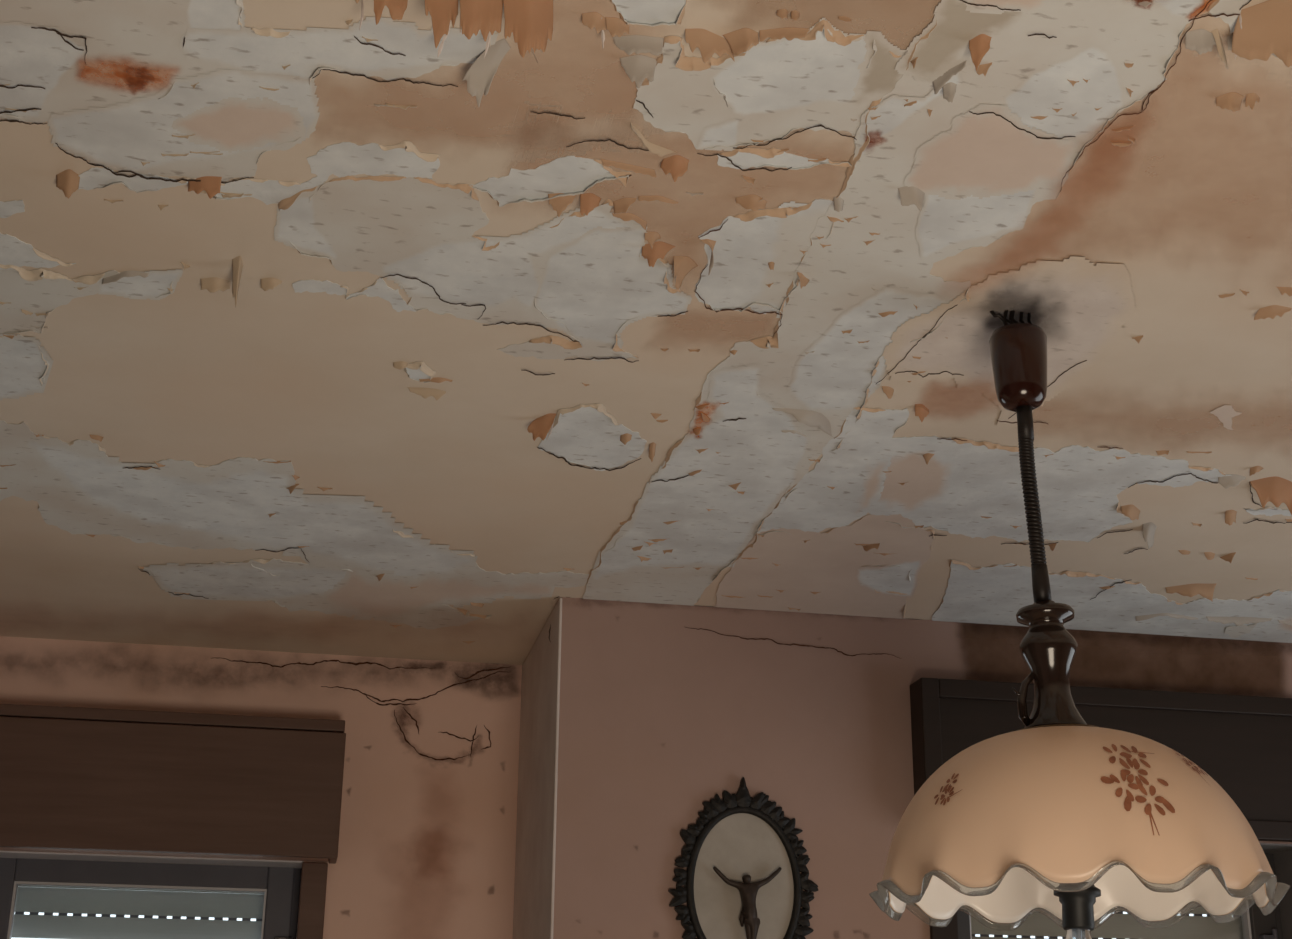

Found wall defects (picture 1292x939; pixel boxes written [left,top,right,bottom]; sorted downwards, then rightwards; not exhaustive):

rust [1190,0,1211,19]
rust [79,61,168,92]
peeling [0,0,1292,644]
crack [686,627,901,659]
crack [223,658,511,760]